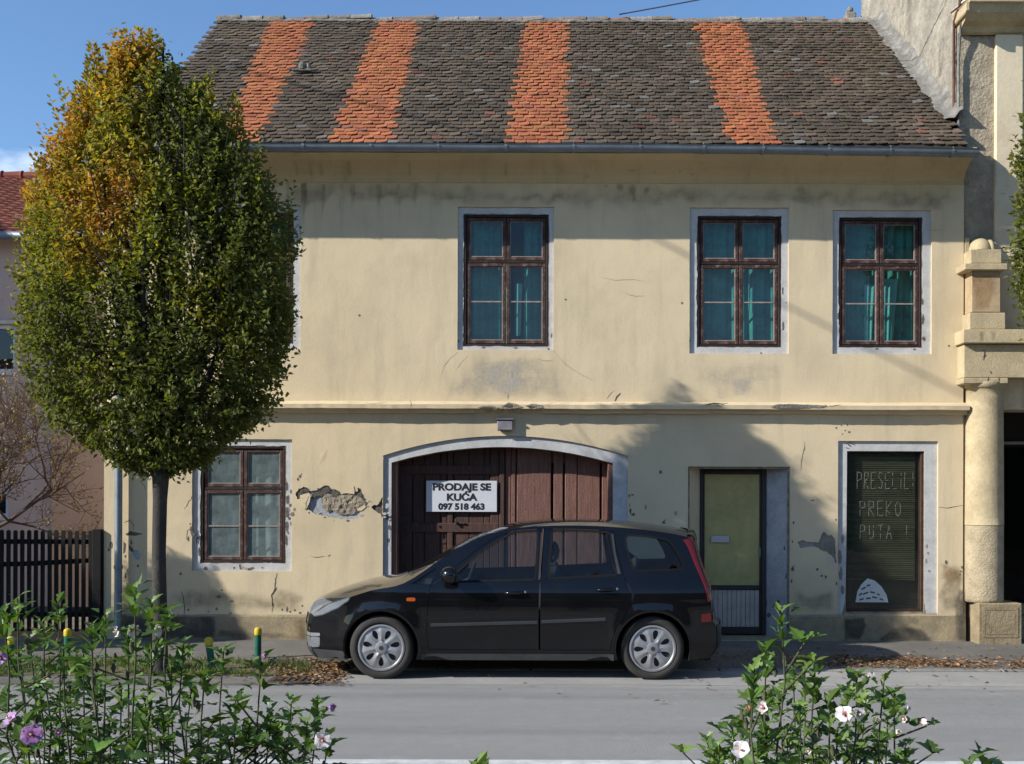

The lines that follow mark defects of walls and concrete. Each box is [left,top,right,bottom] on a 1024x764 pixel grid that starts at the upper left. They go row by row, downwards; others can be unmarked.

flaking render [285,473,392,552]
peeling [784,532,844,594]